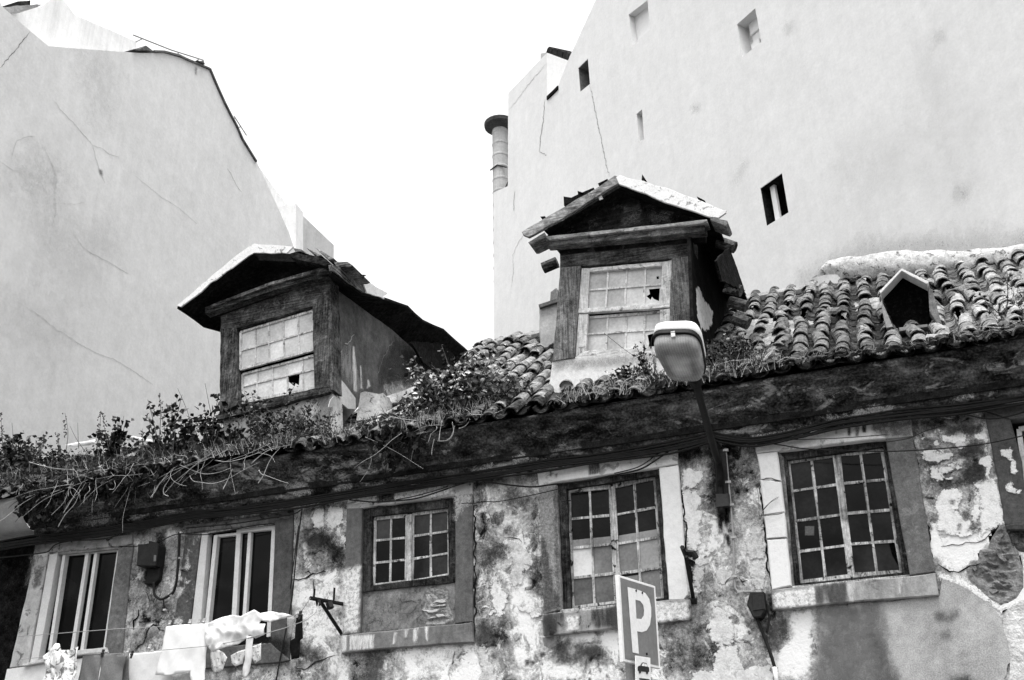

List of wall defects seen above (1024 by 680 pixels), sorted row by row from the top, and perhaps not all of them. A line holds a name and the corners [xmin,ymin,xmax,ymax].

peeling [311,506,345,530]
peeling [480,541,542,626]
damp [754,582,898,680]
spalling [920,415,1024,680]